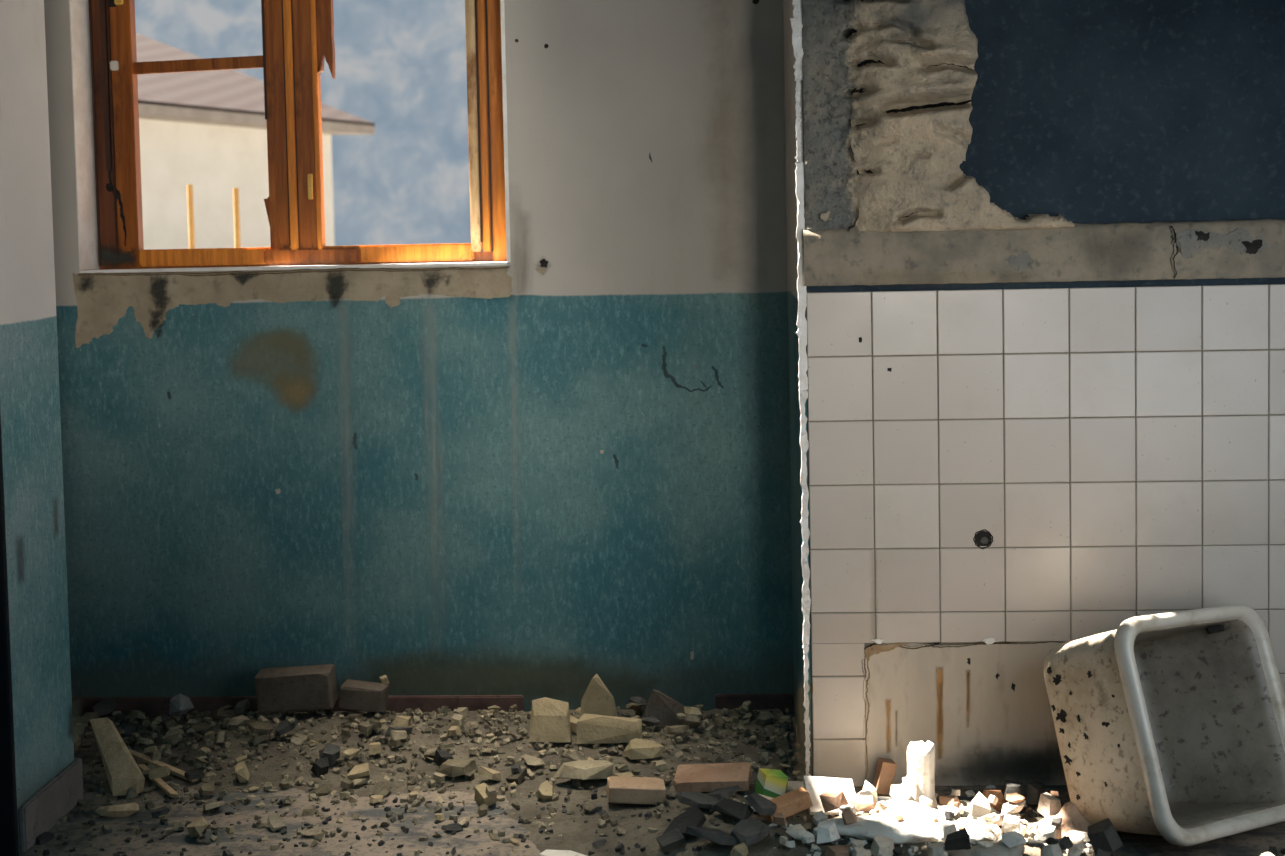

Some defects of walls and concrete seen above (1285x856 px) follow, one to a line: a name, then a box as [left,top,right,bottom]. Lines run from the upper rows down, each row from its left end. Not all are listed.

peeling [73,266,513,348]
crack [662,346,724,392]
peeling [862,637,1070,786]